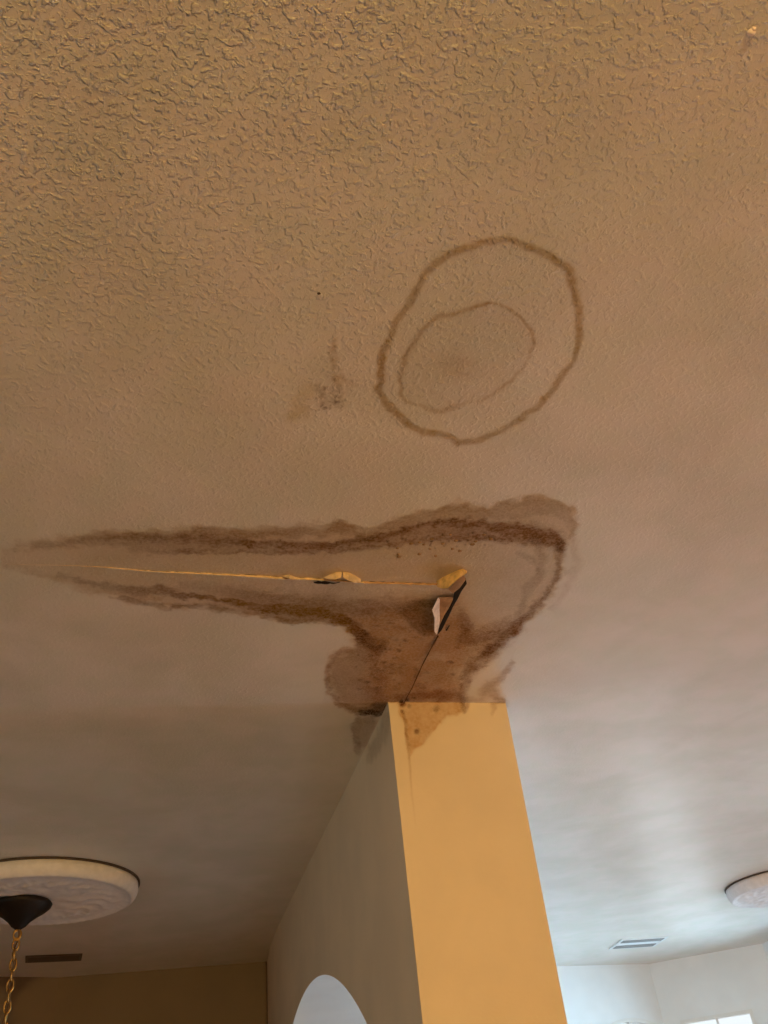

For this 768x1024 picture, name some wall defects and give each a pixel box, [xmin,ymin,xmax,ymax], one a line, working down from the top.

water stain [278,519,562,550]
crack [63,565,453,586]
water stain [187,595,363,633]
crack [403,625,450,704]